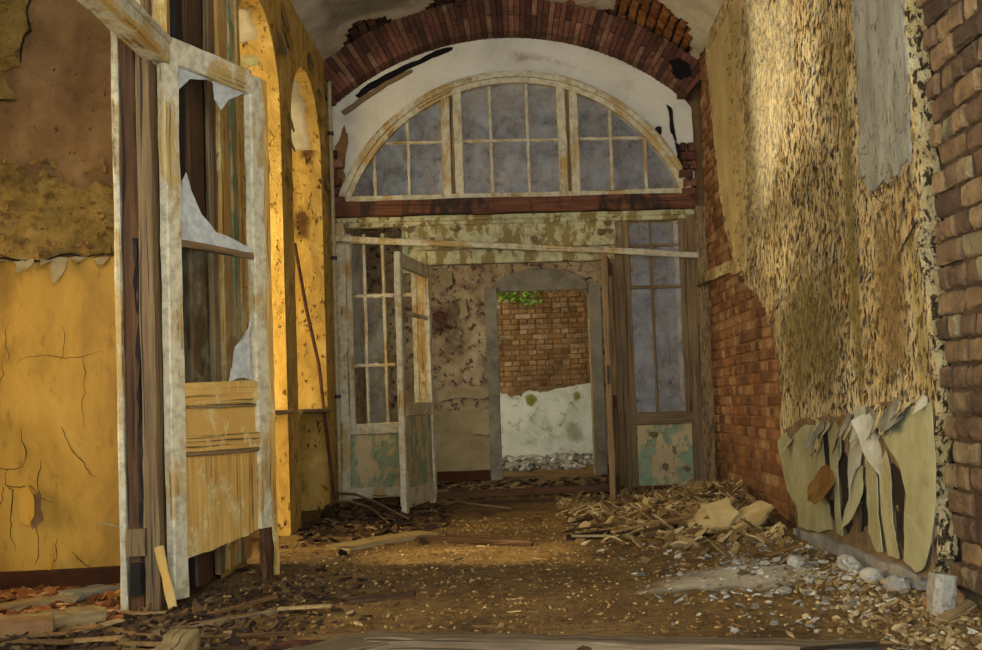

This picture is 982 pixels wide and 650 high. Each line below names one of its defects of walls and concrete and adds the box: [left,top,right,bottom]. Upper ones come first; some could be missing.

peeling [0,0,34,102]
flaking render [342,16,401,48]
flaking render [423,0,478,12]
peeling [0,157,114,285]
peeling [564,0,936,578]
crack [0,323,101,416]
crack [0,427,89,567]
crack [61,427,95,477]